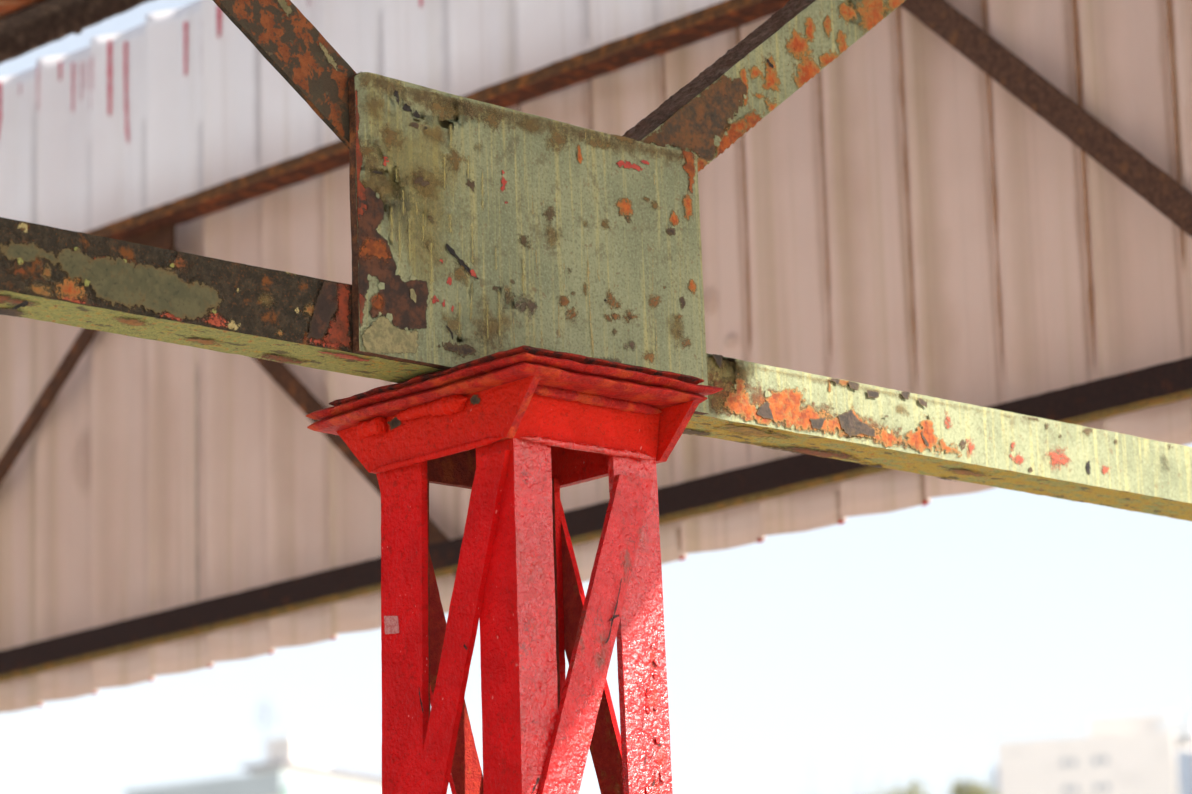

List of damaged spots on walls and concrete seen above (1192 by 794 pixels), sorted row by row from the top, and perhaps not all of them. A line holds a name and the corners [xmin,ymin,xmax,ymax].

peeling [394,90,427,129]
rust [1072,0,1082,107]
rust [1167,0,1180,184]
rust [0,263,87,317]
peeling [0,222,222,320]
rust [204,313,228,328]
peeling [362,316,421,354]
rust [304,0,916,375]
rust [987,75,1002,356]
rust [1081,150,1094,355]
rust [682,367,991,482]